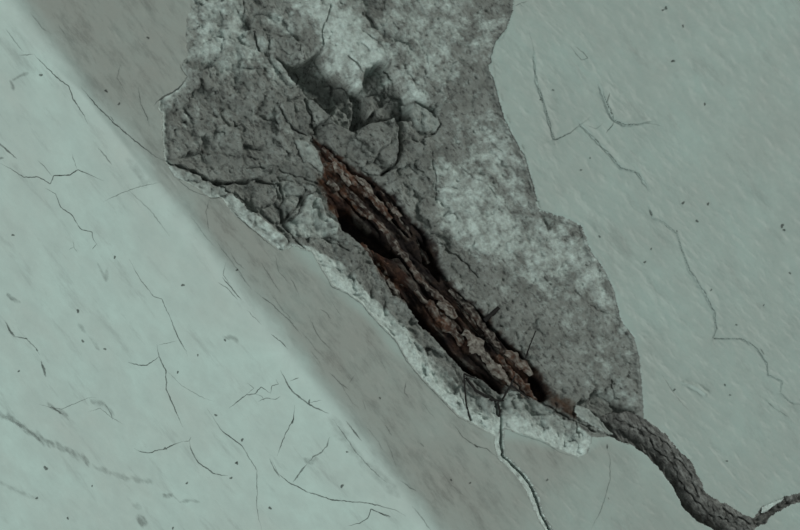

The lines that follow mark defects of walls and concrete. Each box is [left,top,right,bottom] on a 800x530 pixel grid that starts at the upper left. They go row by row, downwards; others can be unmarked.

crack [50,70,144,148]
spalling [158,0,644,458]
rust [312,137,553,403]
crack [285,479,388,524]
crack [493,429,553,530]